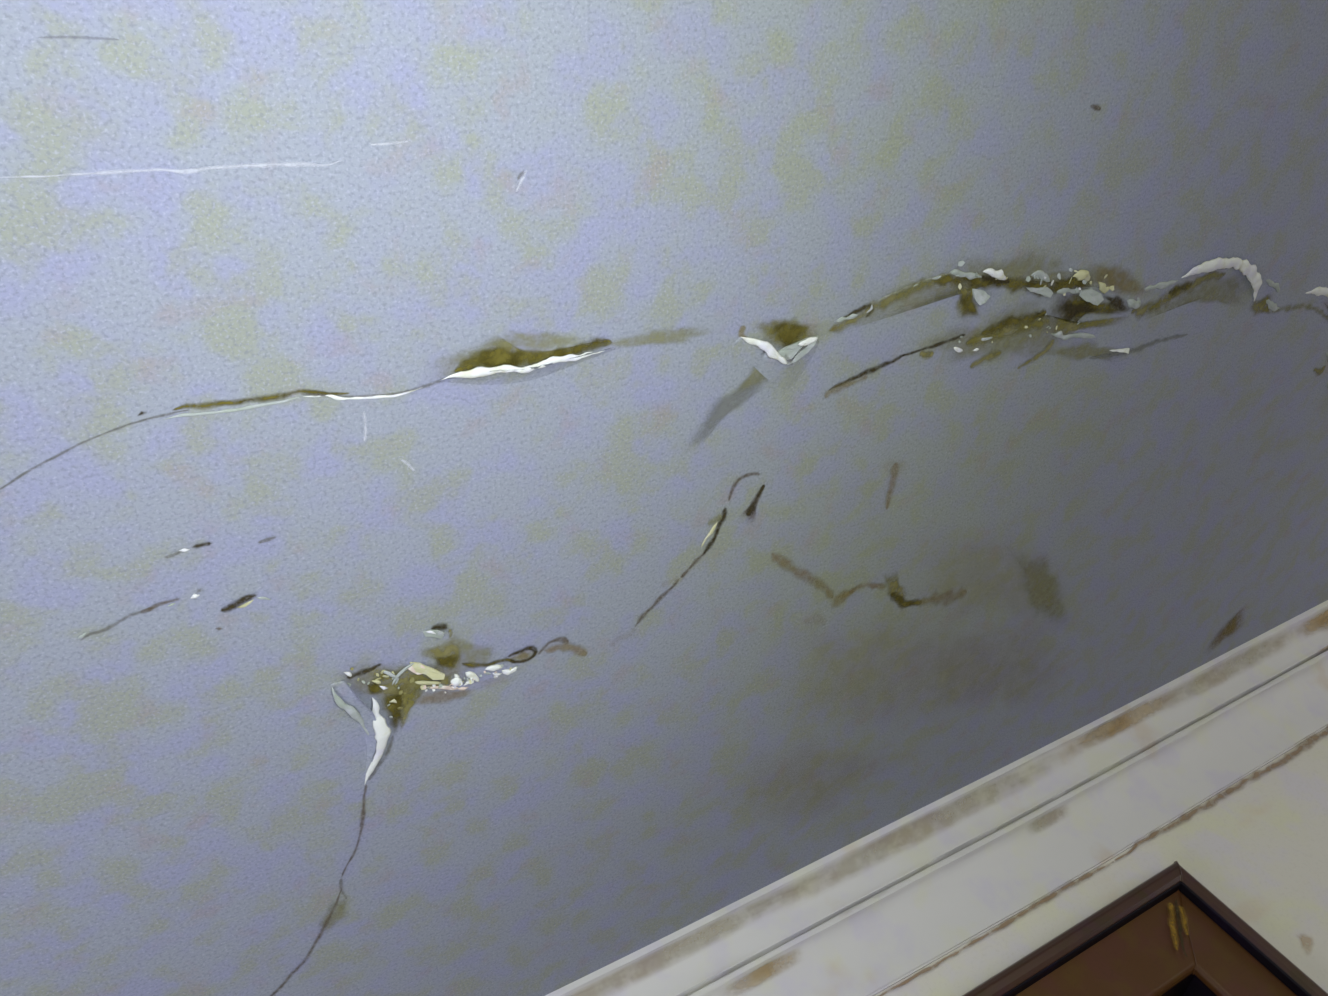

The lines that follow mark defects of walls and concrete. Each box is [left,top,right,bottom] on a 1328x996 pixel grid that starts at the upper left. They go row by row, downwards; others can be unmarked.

crack [1,331,685,489]
peeling [704,257,1328,433]
crack [77,594,199,639]
crack [166,542,211,557]
crack [637,473,765,624]
flaking render [330,624,587,784]
crack [271,785,367,996]